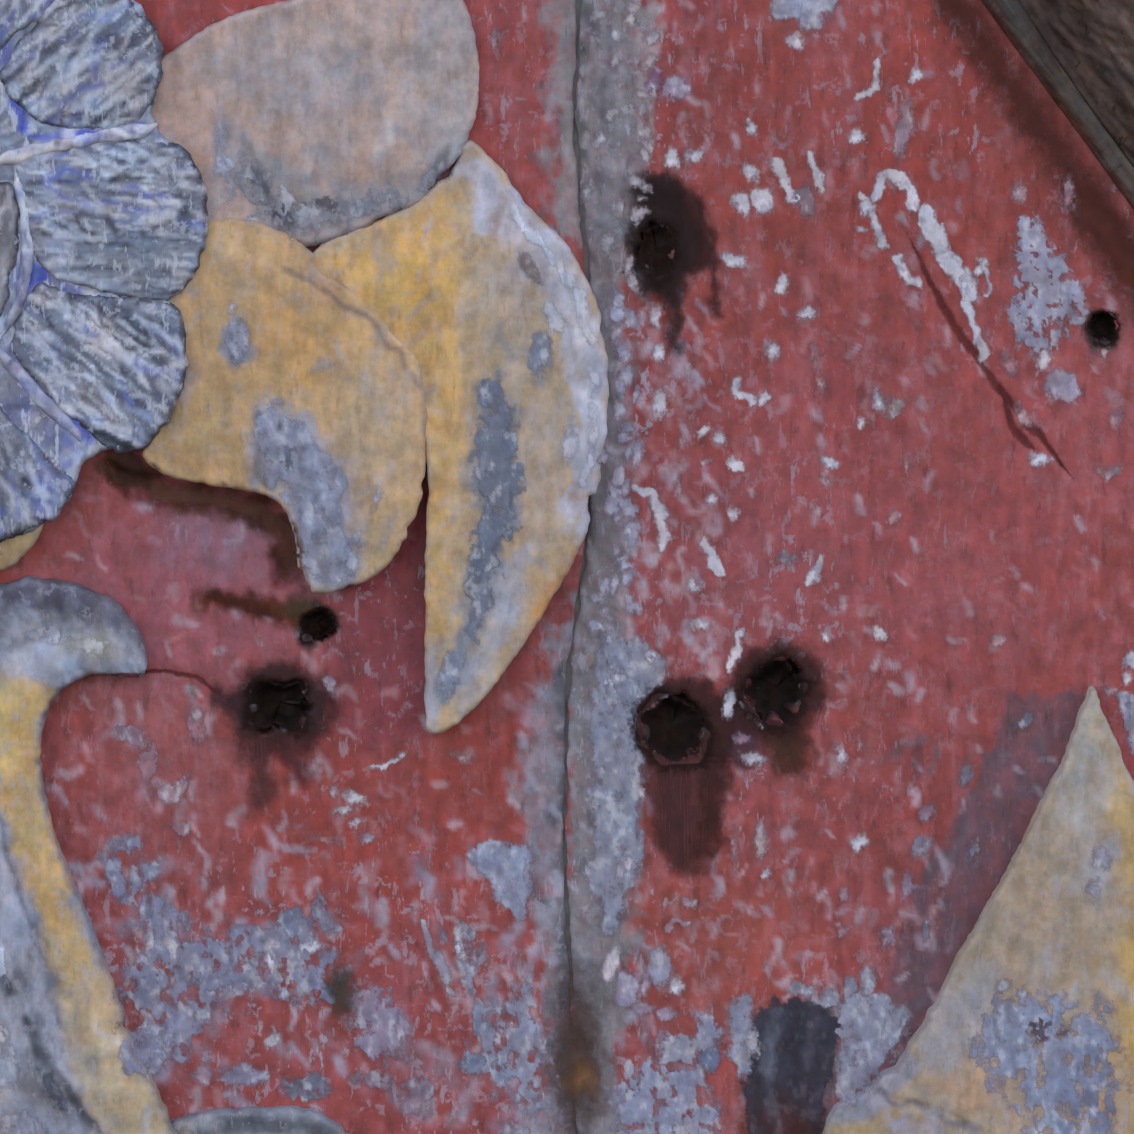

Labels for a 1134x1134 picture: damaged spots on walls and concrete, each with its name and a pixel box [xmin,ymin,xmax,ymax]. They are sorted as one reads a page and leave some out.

peeling [593,2,704,170]
peeling [770,0,837,49]
peeling [730,151,825,219]
peeling [857,100,1089,403]
crack [912,244,1067,471]
peeling [254,398,362,588]
peeling [508,203,910,1134]
peeling [1104,652,1134,755]
peeling [468,839,537,922]
peeling [97,832,435,1120]
peeling [421,919,562,1134]
peeling [970,978,1130,1134]